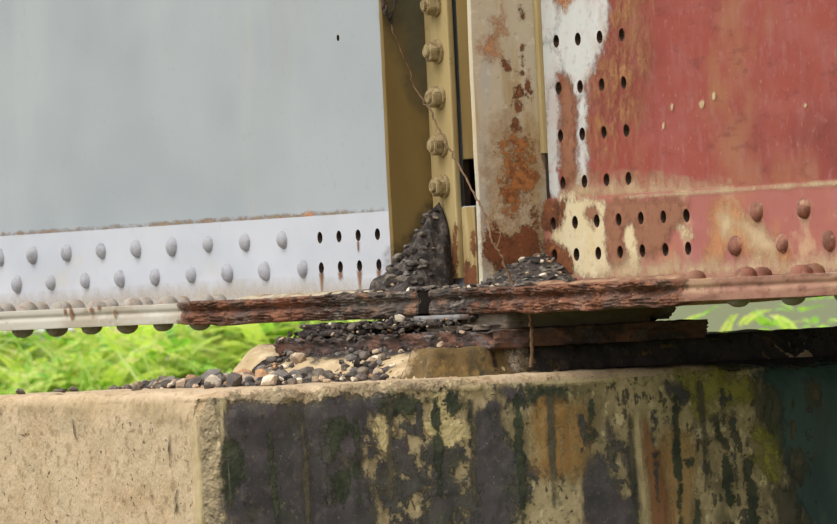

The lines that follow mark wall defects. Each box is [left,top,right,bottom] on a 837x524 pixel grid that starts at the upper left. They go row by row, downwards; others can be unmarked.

rust [451,20,695,314]
peeling [535,0,804,285]
rust [177,273,347,326]
water stain [217,385,541,524]
water stain [547,394,557,507]
water stain [577,399,642,524]
water stain [650,410,660,512]
water stain [665,380,762,524]